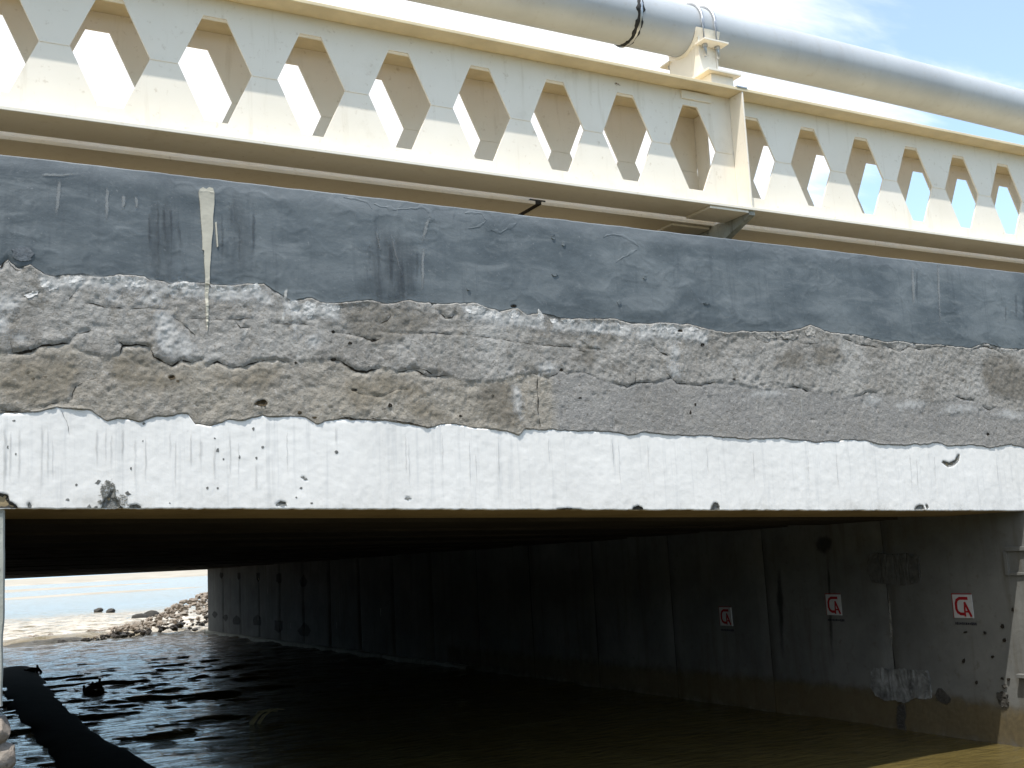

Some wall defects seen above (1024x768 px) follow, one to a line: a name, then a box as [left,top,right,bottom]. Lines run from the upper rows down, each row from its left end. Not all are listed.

peeling [24,276,83,298]
peeling [101,275,147,287]
peeling [167,281,261,292]
peeling [288,301,340,319]
peeling [465,305,520,319]
peeling [537,309,604,333]
peeling [617,323,698,333]
crack [10,331,89,354]
crack [69,296,596,425]
crack [619,348,714,387]
spalling [87,480,141,508]